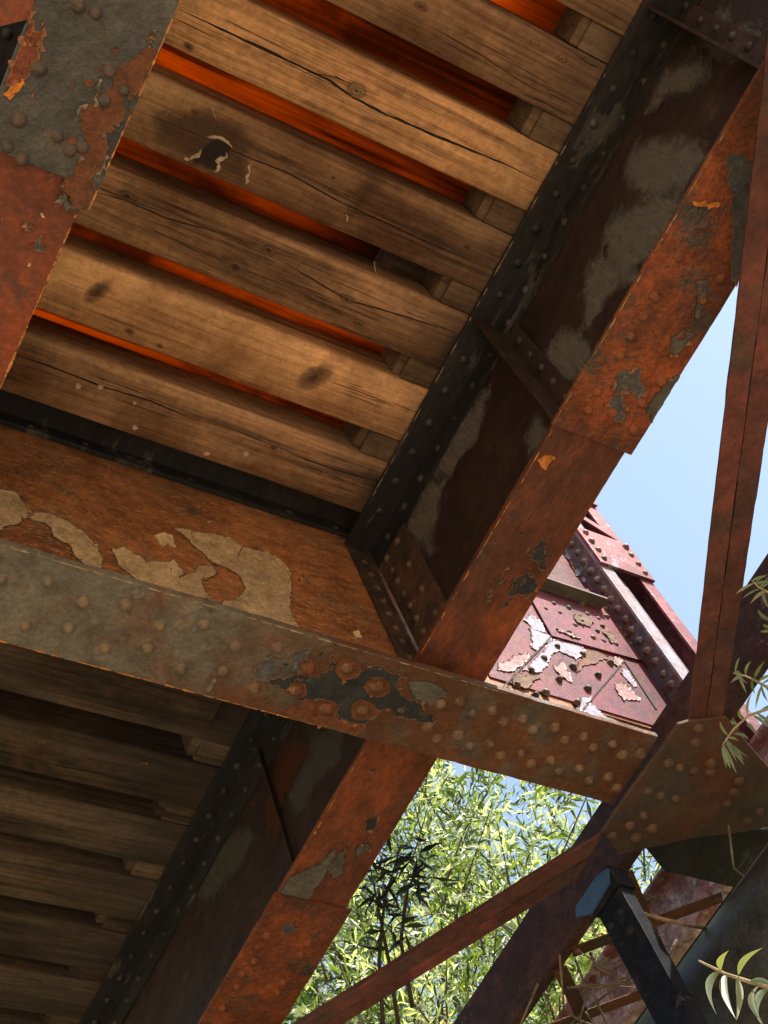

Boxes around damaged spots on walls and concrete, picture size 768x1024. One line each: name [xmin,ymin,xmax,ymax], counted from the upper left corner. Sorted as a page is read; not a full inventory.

peeling [6,10,47,87]
crack [175,9,530,177]
corrosion [0,0,182,388]
peeling [604,367,680,423]
corrosion [521,451,556,483]
peeling [0,489,310,627]
peeling [254,643,447,812]
peeling [497,613,586,683]
corrosion [573,614,618,674]
peeling [575,696,619,722]
peeling [613,656,641,702]
peeling [279,814,381,900]